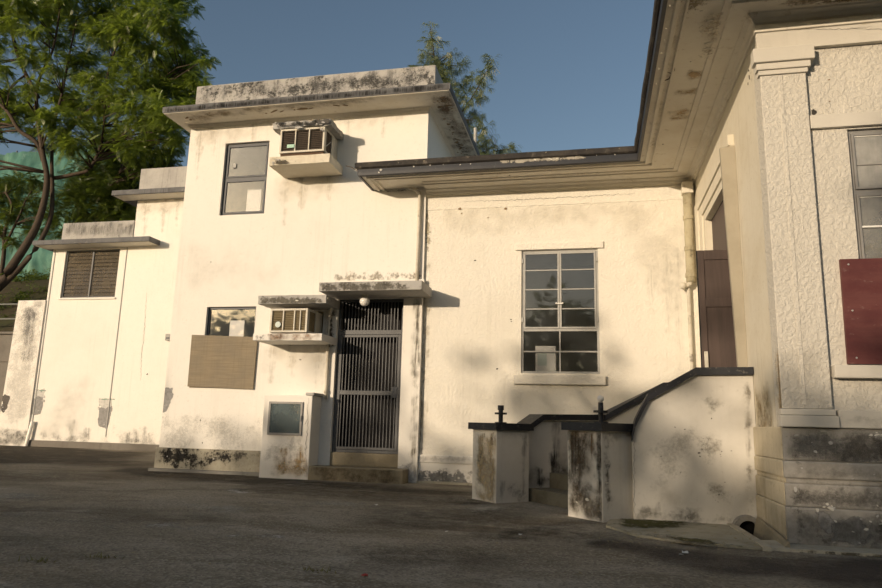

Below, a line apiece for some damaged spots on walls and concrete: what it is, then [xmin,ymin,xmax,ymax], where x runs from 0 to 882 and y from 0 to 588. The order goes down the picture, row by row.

water stain [167,66,443,112]
spalling [1,394,10,413]
water stain [0,431,496,528]
mould [551,431,610,522]